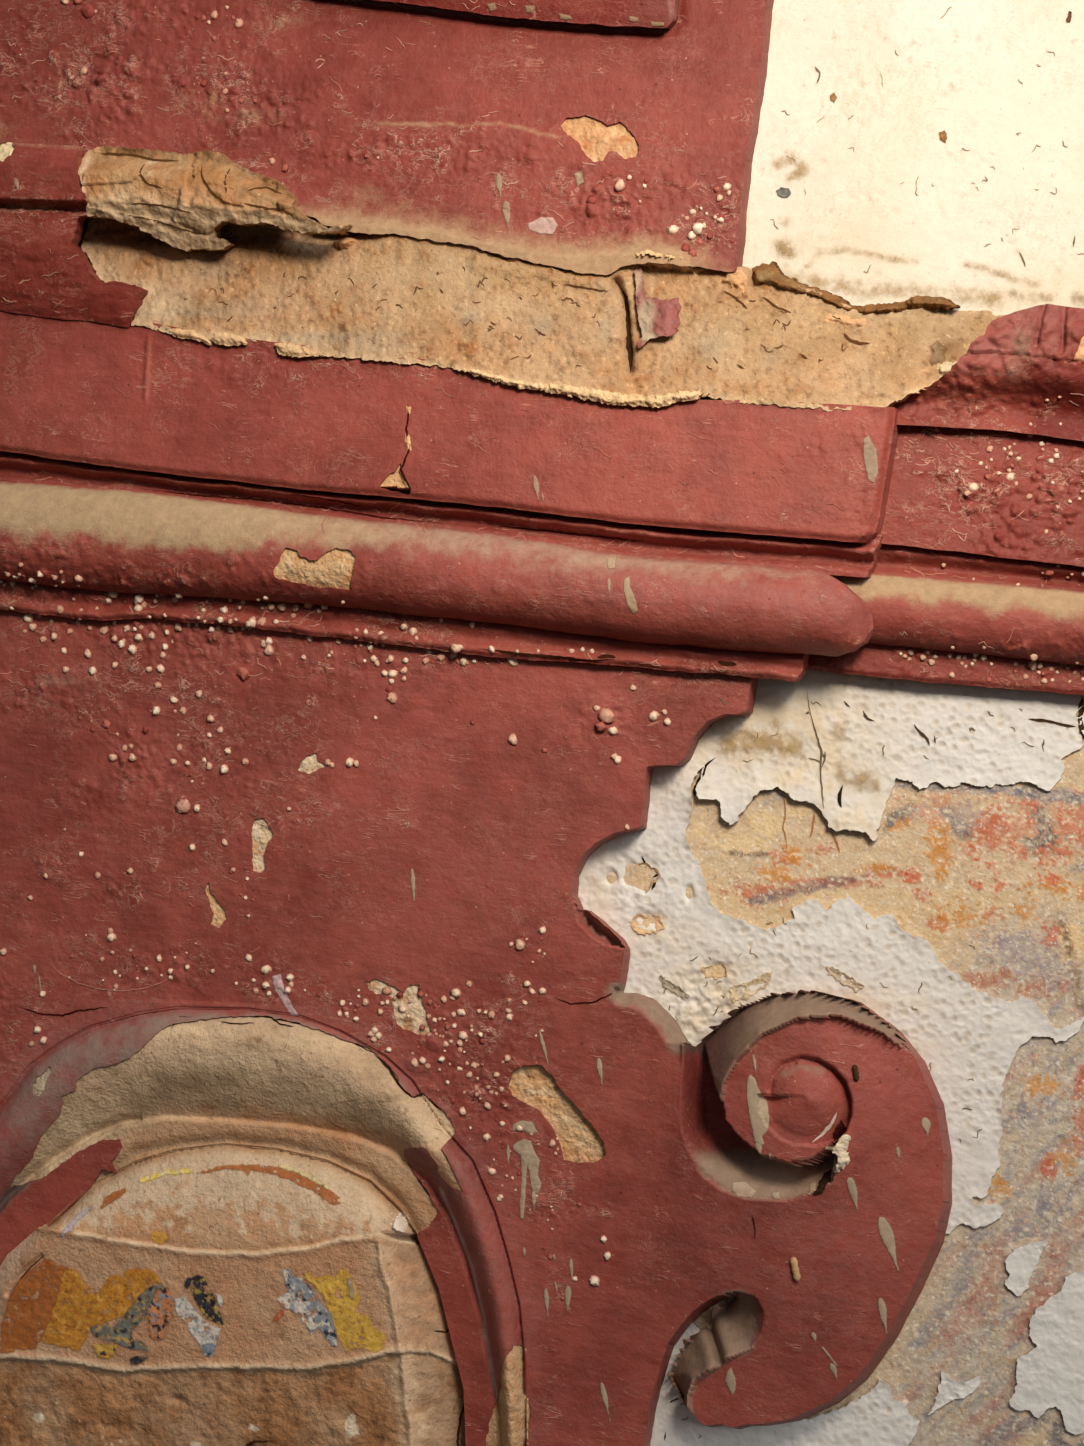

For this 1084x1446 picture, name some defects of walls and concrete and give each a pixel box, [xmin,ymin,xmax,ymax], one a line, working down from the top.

spalling [7,114,353,252]
peeling [558,115,639,202]
peeling [274,548,355,590]
crack [782,694,843,853]
crack [914,724,936,746]
peeling [578,670,1084,1234]
peeling [10,1017,463,1232]
peeling [509,1056,606,1163]
peeling [1005,1241,1048,1296]
peeling [486,1345,531,1446]
peeling [650,1322,980,1446]
peeling [1009,1270,1084,1436]